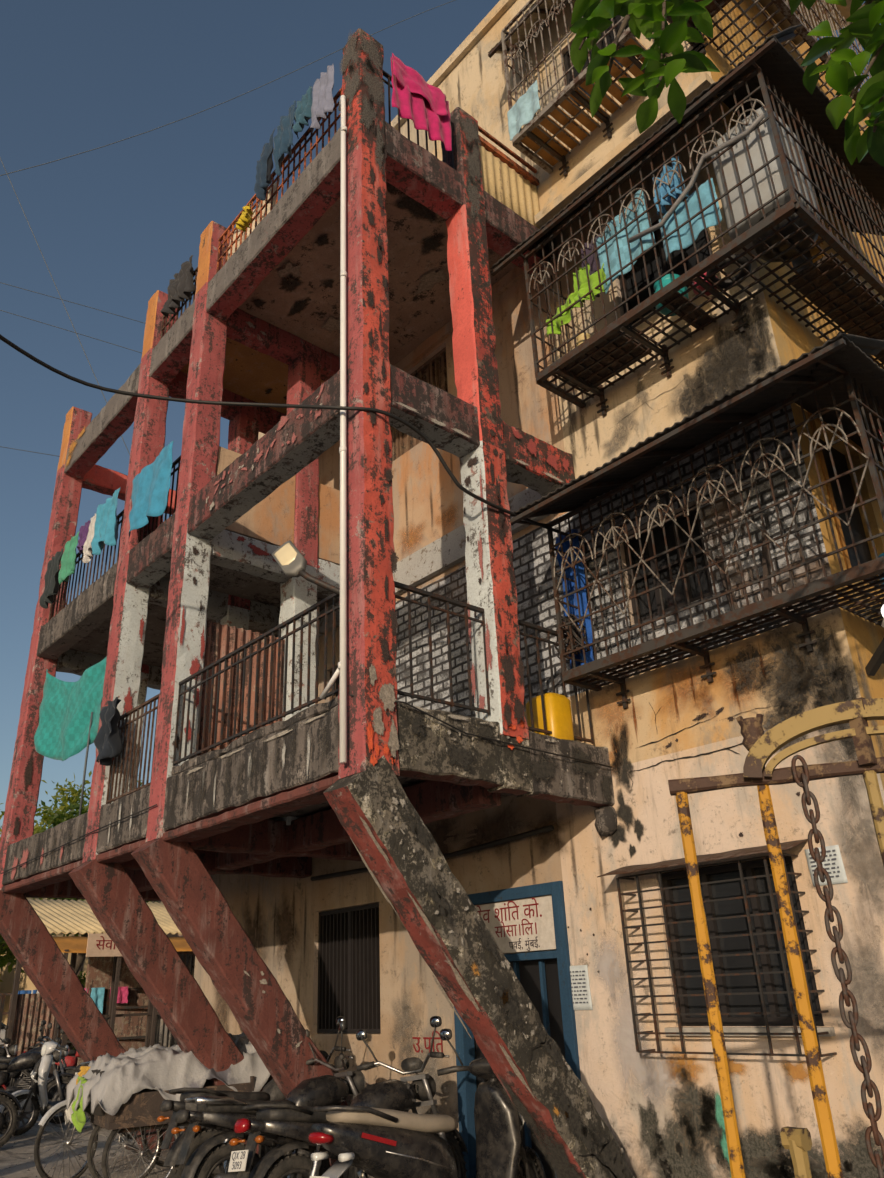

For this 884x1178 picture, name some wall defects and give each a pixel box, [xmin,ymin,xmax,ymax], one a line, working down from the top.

mould [280,275,309,316]
peeling [367,145,388,381]
mould [386,182,444,254]
damp [674,298,777,416]
spalling [367,469,429,766]
peeling [123,687,133,714]
peeling [173,626,205,750]
damp [448,745,473,771]
damp [725,625,871,734]
damp [780,723,857,763]
peeling [350,837,403,923]
peeling [406,890,480,1012]